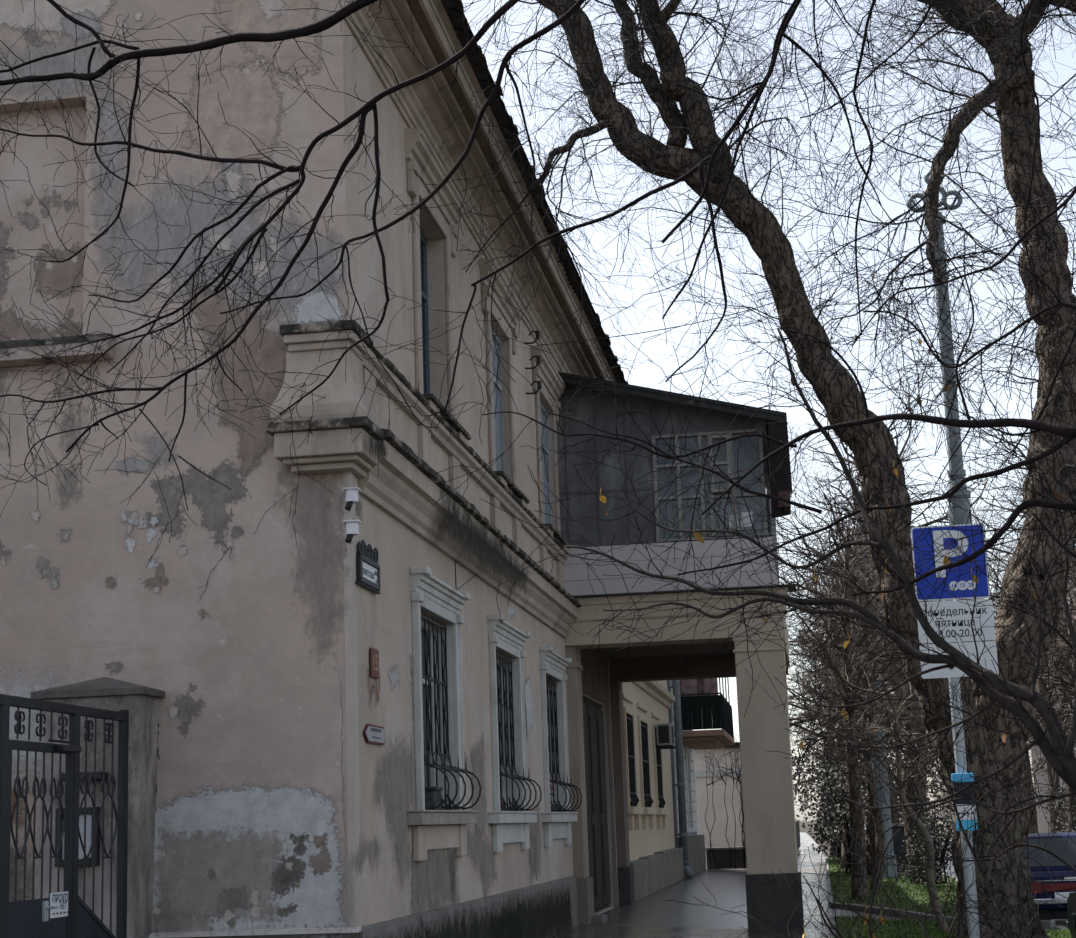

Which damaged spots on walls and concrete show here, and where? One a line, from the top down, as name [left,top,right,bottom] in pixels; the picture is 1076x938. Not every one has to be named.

peeling [0,0,142,48]
peeling [178,0,324,190]
peeling [116,280,303,561]
peeling [136,557,169,594]
water stain [278,464,346,651]
peeling [167,683,207,739]
peeling [214,832,332,928]
water stain [375,735,496,913]